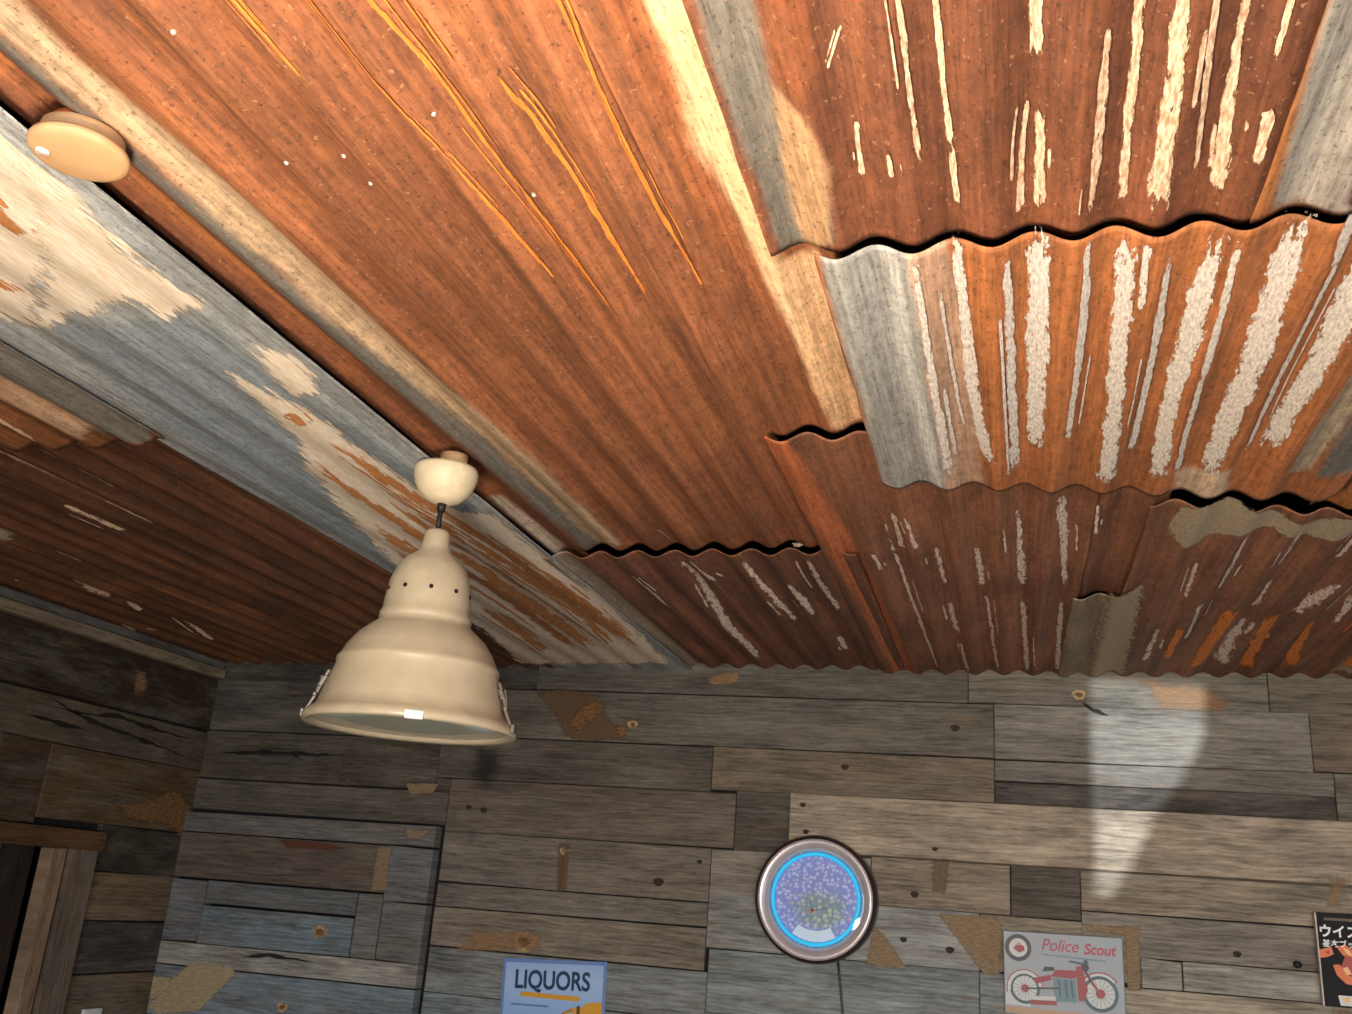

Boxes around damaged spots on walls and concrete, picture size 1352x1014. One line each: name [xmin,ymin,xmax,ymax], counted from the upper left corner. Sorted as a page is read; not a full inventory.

corrosion [0,199,36,236]
peeling [0,125,211,330]
corrosion [306,0,609,307]
corrosion [498,68,651,301]
corrosion [556,0,703,285]
peeling [911,226,1052,475]
peeling [1096,234,1241,483]
peeling [1146,0,1275,210]
peeling [1200,212,1352,476]
peeling [224,342,669,665]
corrosion [314,444,638,652]
corrosion [1165,497,1352,548]